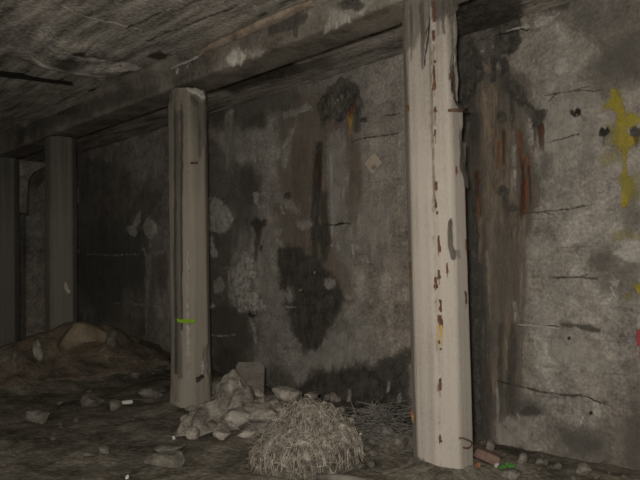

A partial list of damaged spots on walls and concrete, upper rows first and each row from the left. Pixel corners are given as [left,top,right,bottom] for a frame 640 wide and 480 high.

crack [545,86,600,103]
leakage [277,95,411,415]
rust [475,122,511,300]
leakage [420,0,605,449]
rust [514,130,531,255]
crack [519,205,586,215]
crack [553,272,598,280]
crack [497,380,605,404]